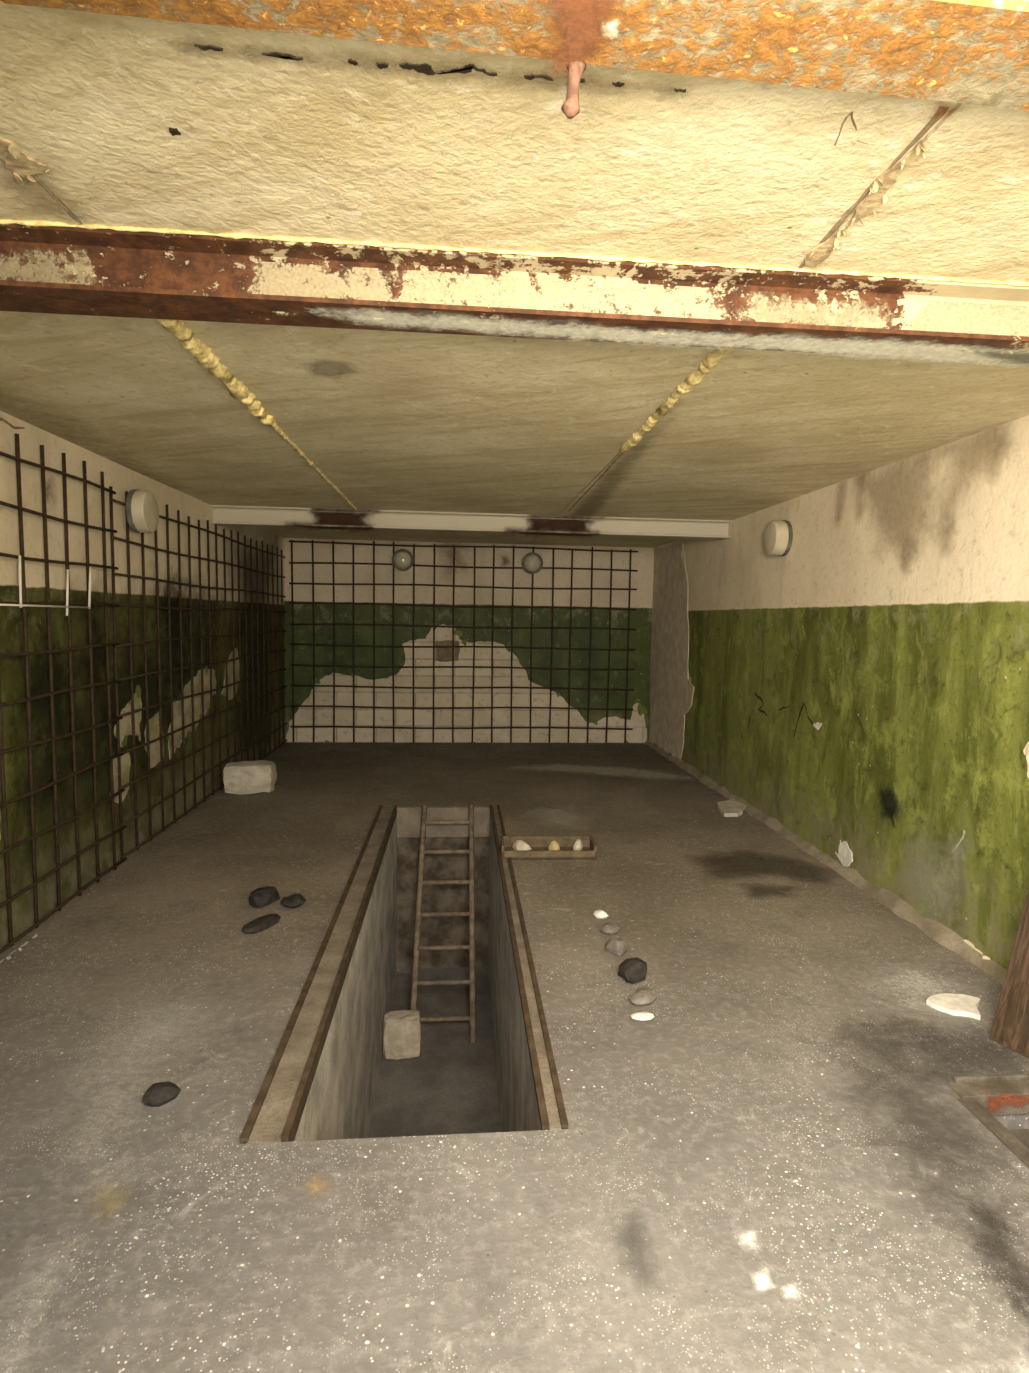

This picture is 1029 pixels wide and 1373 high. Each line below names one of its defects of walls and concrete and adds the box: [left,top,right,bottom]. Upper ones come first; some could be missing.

rust [551,0,614,119]
crack [33,176,82,225]
crack [798,106,949,269]
crack [568,451,626,511]
damp [860,464,924,558]
peeling [286,543,695,759]
peeling [110,648,242,803]